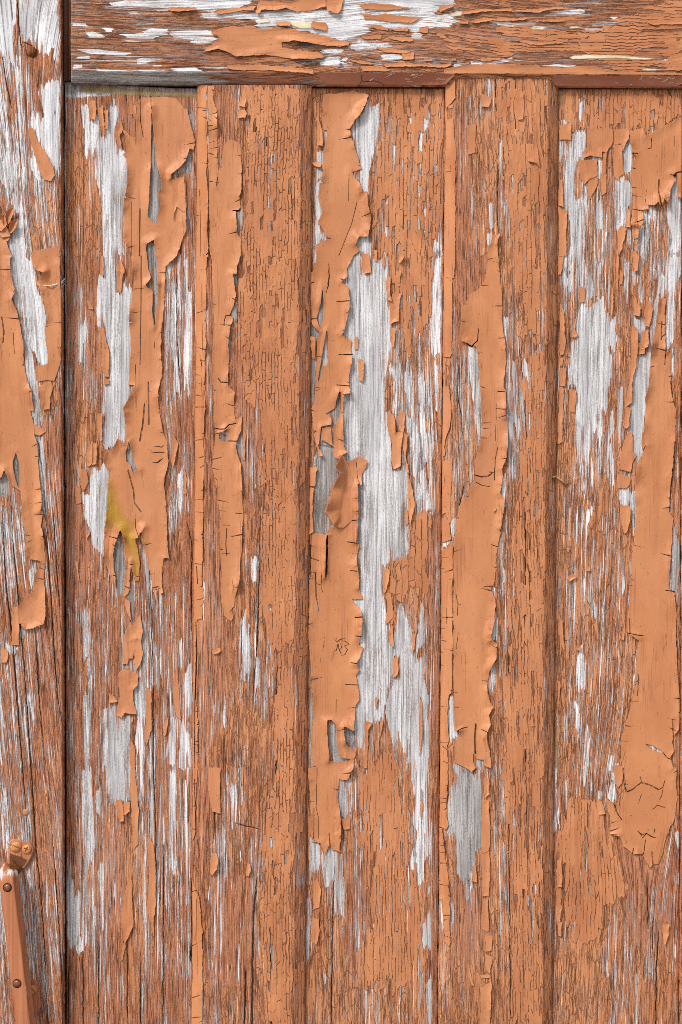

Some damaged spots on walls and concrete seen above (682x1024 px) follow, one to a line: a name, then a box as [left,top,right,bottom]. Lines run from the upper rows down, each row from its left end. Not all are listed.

peeling [0,0,60,69]
peeling [71,22,113,38]
peeling [73,49,202,72]
peeling [109,0,682,966]
crack [437,0,682,1024]
peeling [0,79,273,1024]
peeling [606,953,625,993]